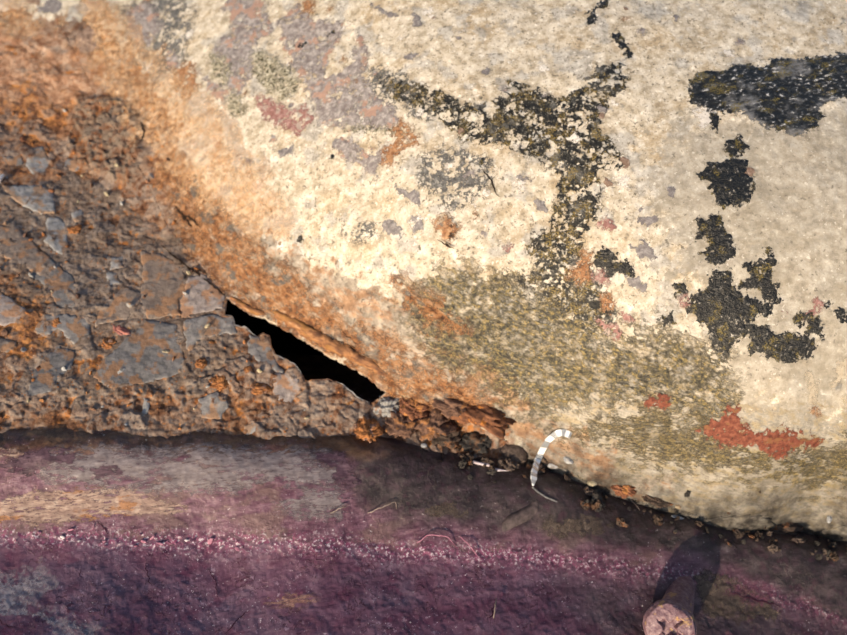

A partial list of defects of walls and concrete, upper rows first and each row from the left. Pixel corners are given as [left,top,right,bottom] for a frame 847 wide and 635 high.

peeling [194,0,400,180]
corrosion [3,147,48,174]
corrosion [29,61,495,412]
crack [331,329,378,363]
corrosion [198,391,229,420]
corrosion [695,403,825,460]